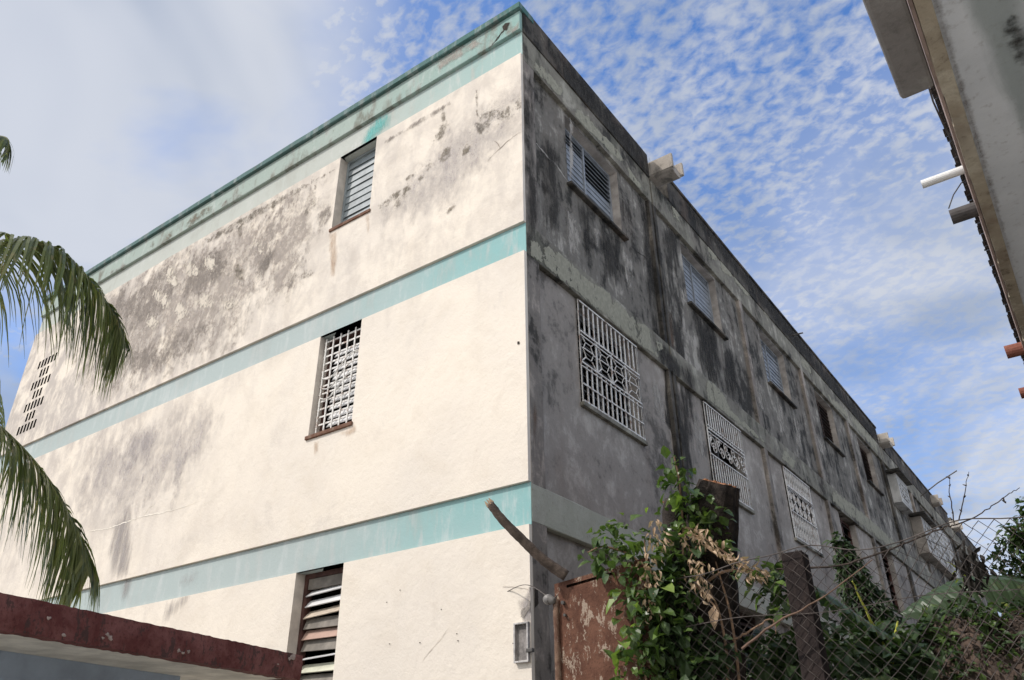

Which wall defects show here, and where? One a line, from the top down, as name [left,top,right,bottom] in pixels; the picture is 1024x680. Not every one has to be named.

water stain [476,78,633,286]
water stain [552,50,646,171]
water stain [86,184,330,389]
water stain [655,188,880,441]